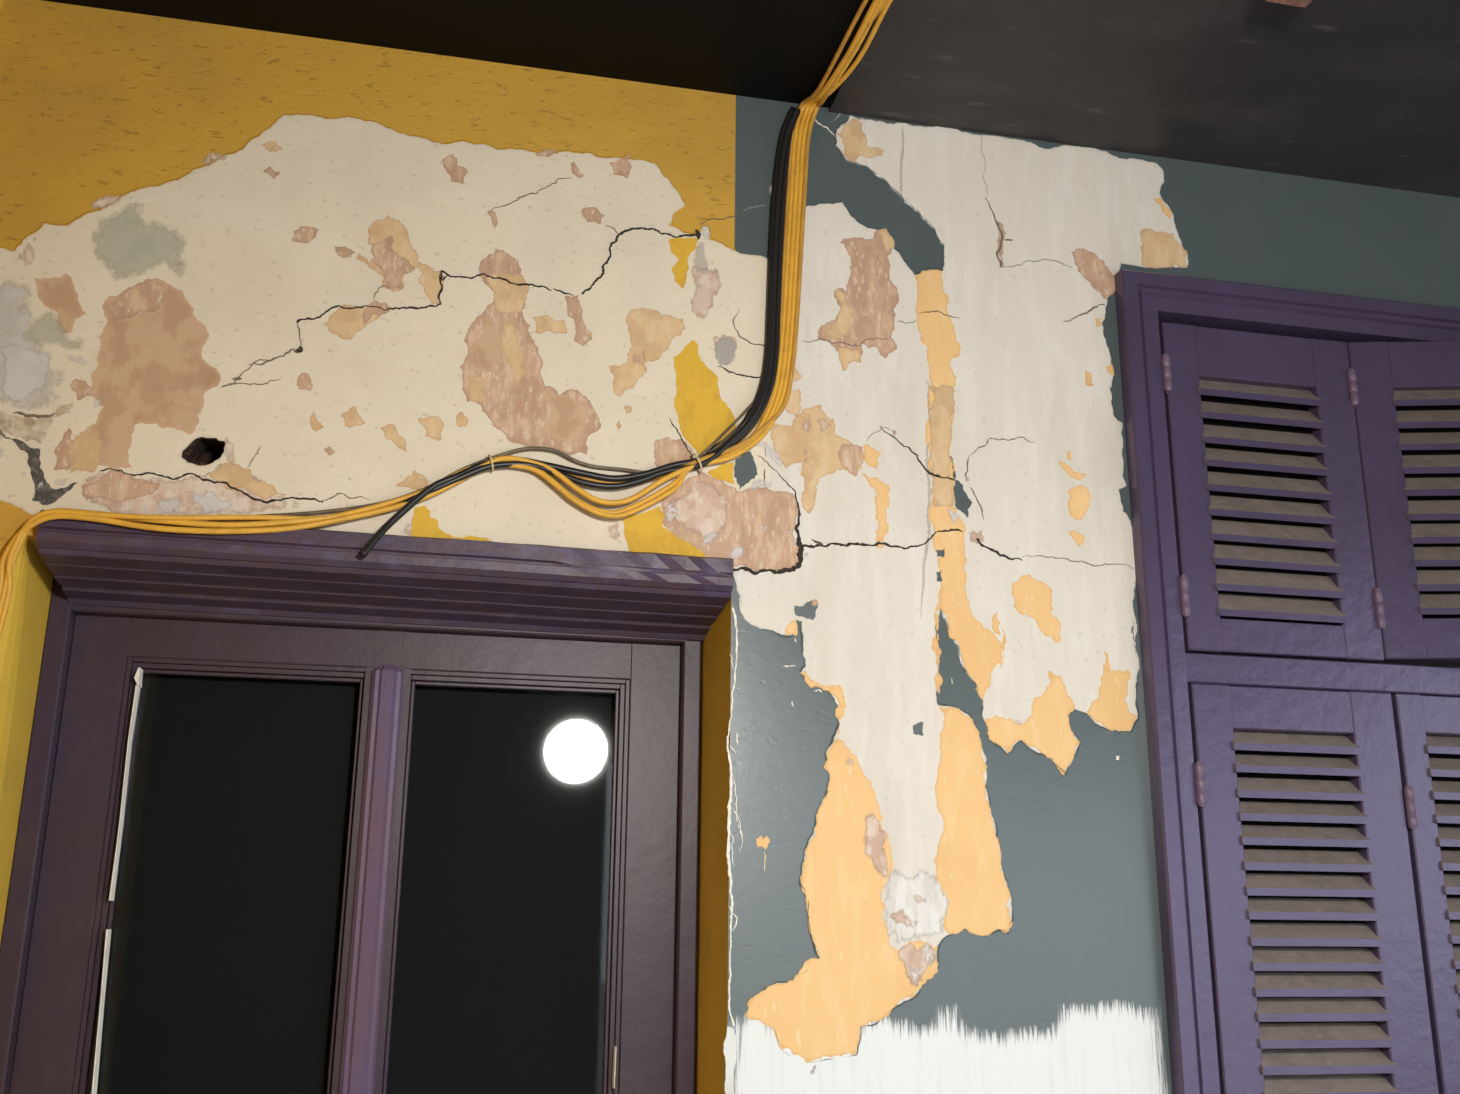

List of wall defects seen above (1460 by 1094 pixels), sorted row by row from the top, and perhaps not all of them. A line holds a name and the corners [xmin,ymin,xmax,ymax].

crack [985,198,1072,268]
crack [222,212,741,387]
crack [718,311,765,378]
crack [805,310,959,347]
crack [1063,304,1105,322]
crack [0,430,366,505]
crack [670,418,691,455]
crack [733,426,1133,575]
peeling [0,113,1189,1063]